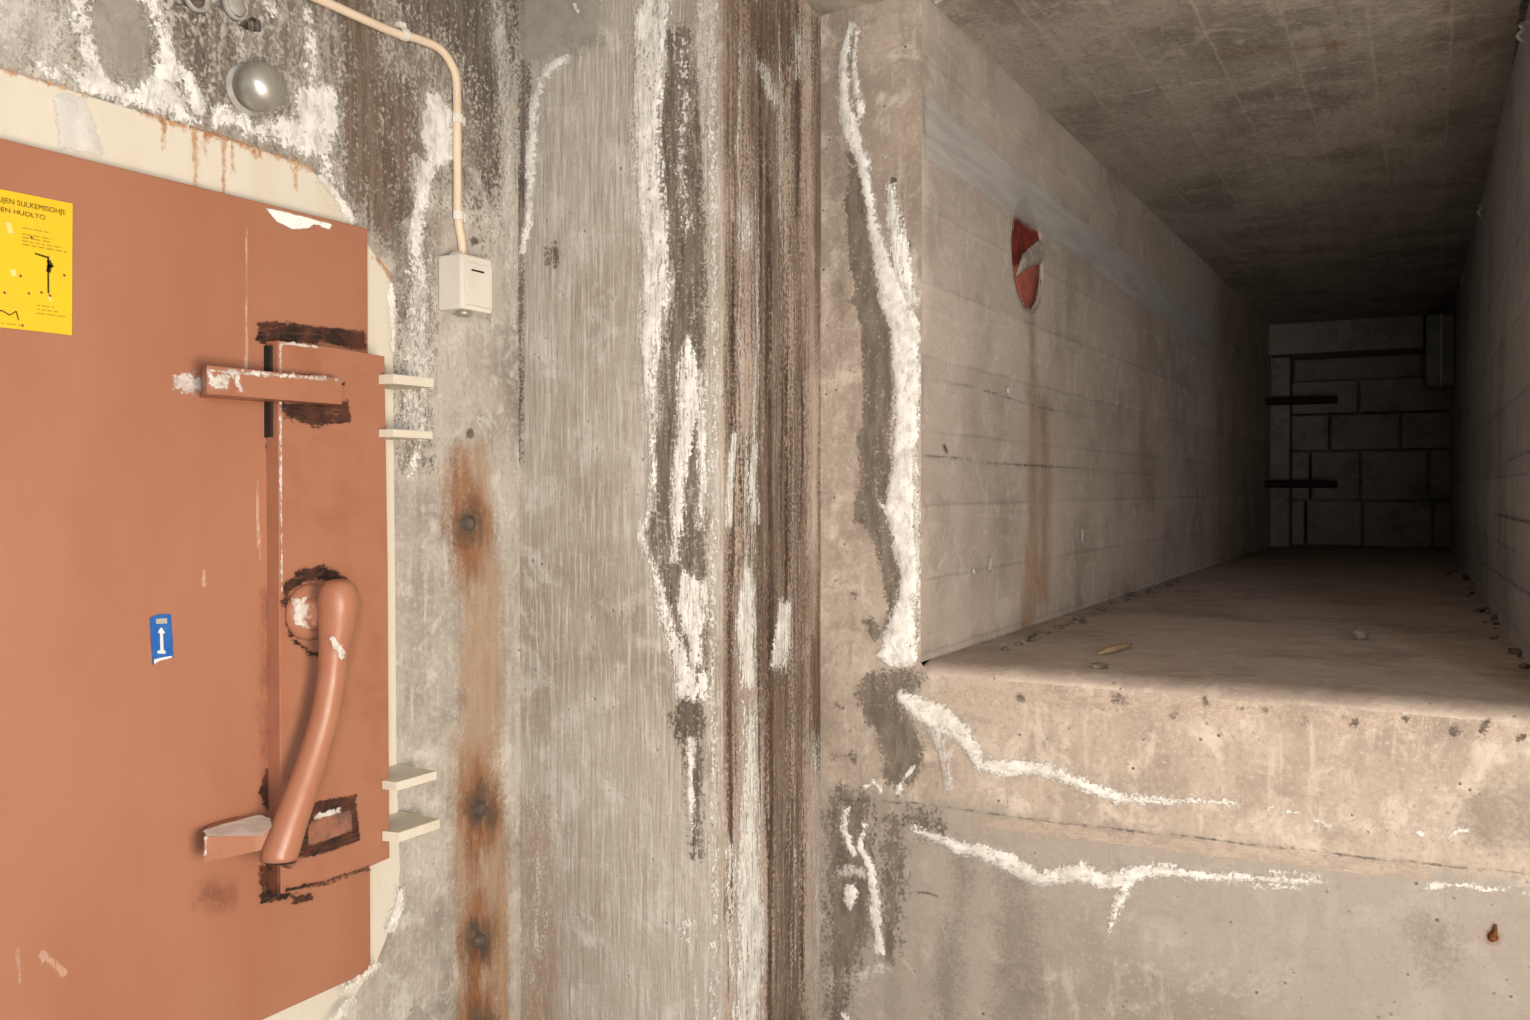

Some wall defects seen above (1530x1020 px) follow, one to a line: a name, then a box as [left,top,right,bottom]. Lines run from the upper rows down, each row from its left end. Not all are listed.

water stain [0,0,572,482]
corrosion [451,447,552,1020]
water stain [626,0,1327,1020]